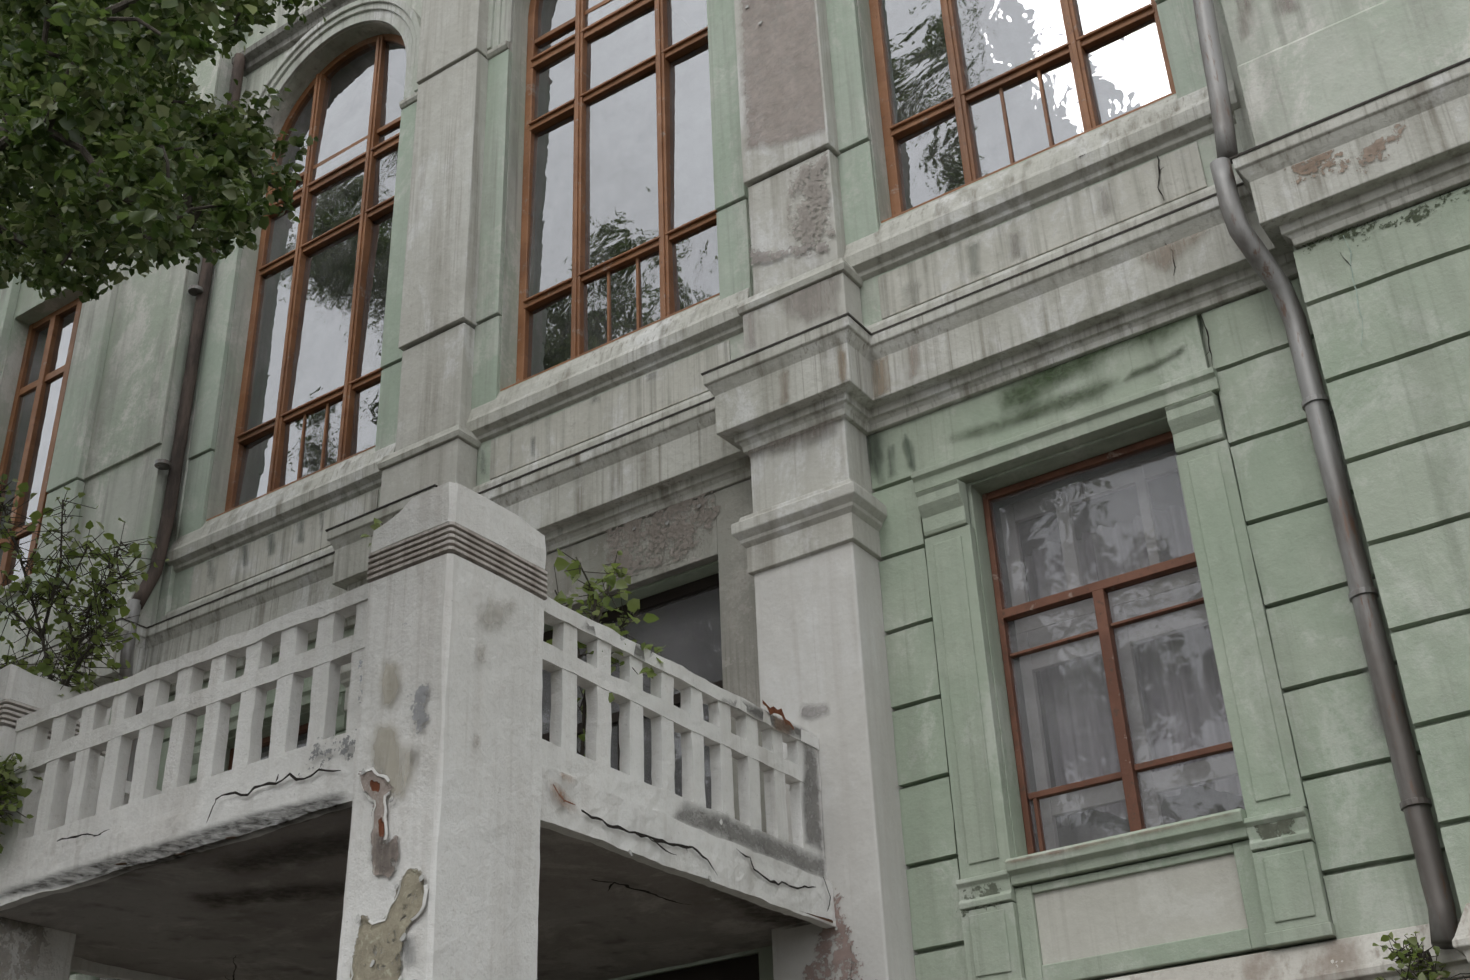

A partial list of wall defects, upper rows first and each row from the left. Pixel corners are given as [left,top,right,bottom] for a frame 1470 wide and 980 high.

mould [969,318,1184,434]
spalling [0,795,345,898]
crack [206,768,341,823]
flaking render [298,729,428,980]
crack [581,809,831,911]
flaking render [0,918,51,980]
peeling [739,888,863,980]